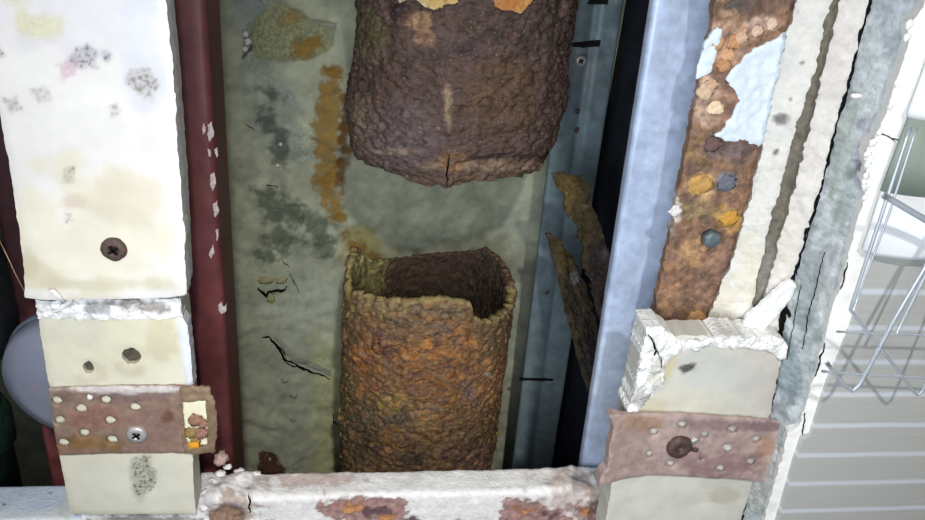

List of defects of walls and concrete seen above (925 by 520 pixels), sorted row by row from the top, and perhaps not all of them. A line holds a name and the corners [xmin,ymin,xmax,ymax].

corrosion [310,67,352,222]
spalling [35,288,186,321]
corrosion [545,171,610,395]
crack [262,334,331,380]
spalling [618,308,788,412]
corrosion [316,496,418,520]
corrosion [499,497,598,520]